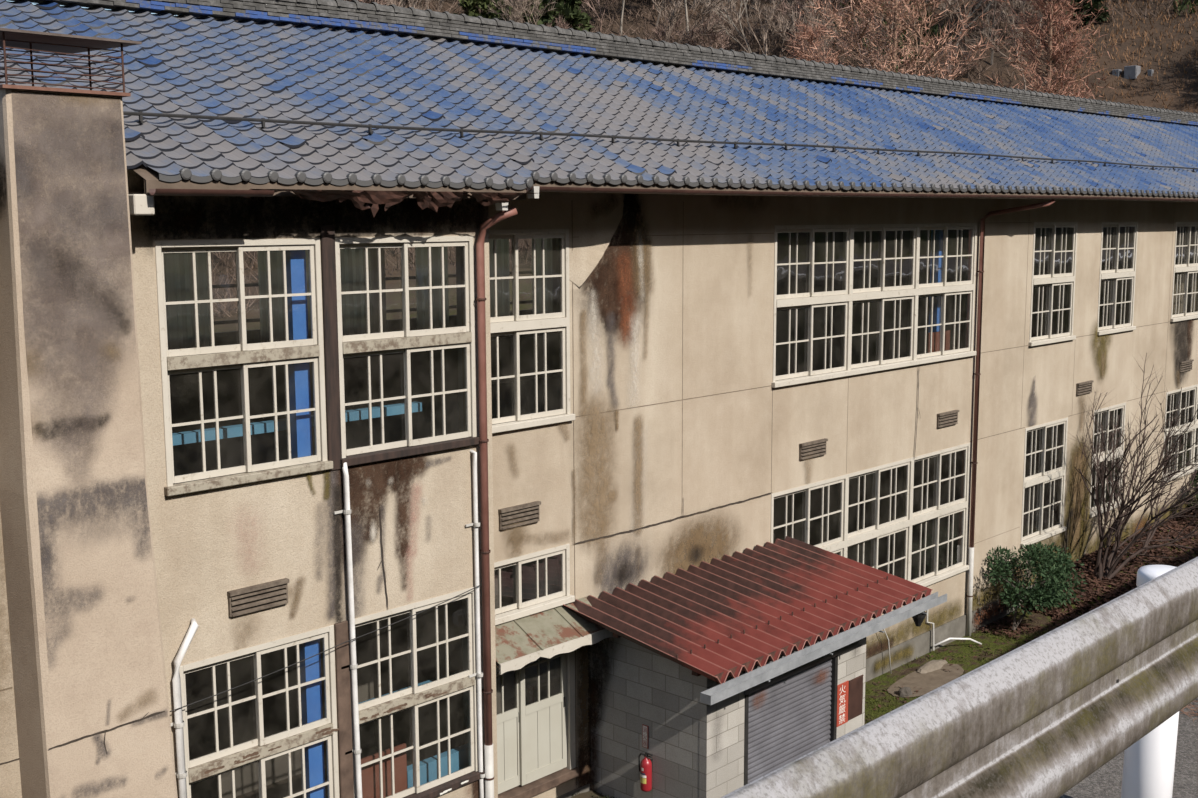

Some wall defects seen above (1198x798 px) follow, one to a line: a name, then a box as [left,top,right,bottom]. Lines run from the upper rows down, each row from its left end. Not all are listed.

damp [410,198,489,232]
rust [583,193,652,405]
damp [573,312,619,581]
damp [634,418,642,533]
damp [37,479,150,604]
rust [875,646,913,671]
crack [49,711,165,753]